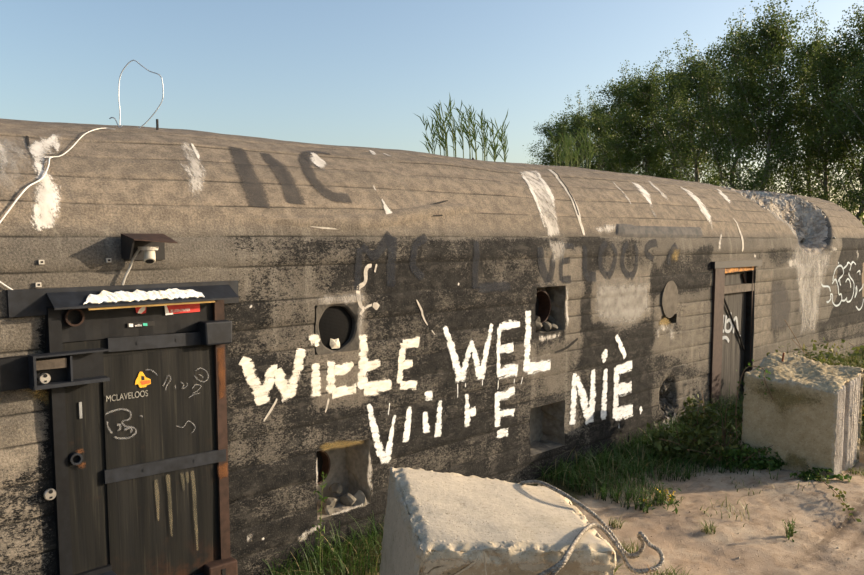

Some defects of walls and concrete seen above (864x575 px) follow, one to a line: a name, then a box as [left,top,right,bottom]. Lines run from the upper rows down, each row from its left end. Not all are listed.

damp [29,134,60,231]
efflorescence [183,143,205,191]
spalling [711,184,836,264]
damp [771,282,791,331]
damp [780,248,837,329]